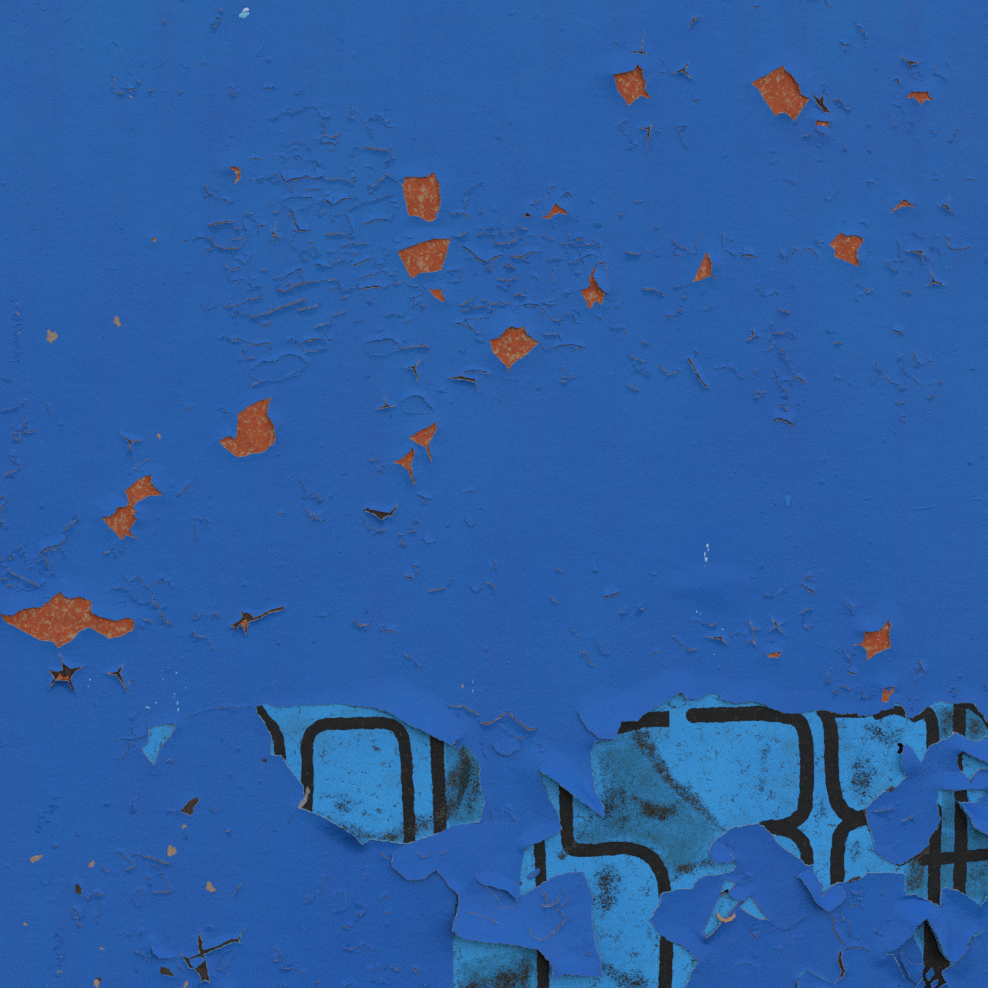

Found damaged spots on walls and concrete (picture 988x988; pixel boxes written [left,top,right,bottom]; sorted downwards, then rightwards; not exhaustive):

peeling [263,215,287,256]
peeling [379,155,464,318]
peeling [538,187,584,232]
peeling [566,244,627,324]
peeling [443,302,554,396]
peeling [244,595,988,988]
peeling [150,921,251,988]